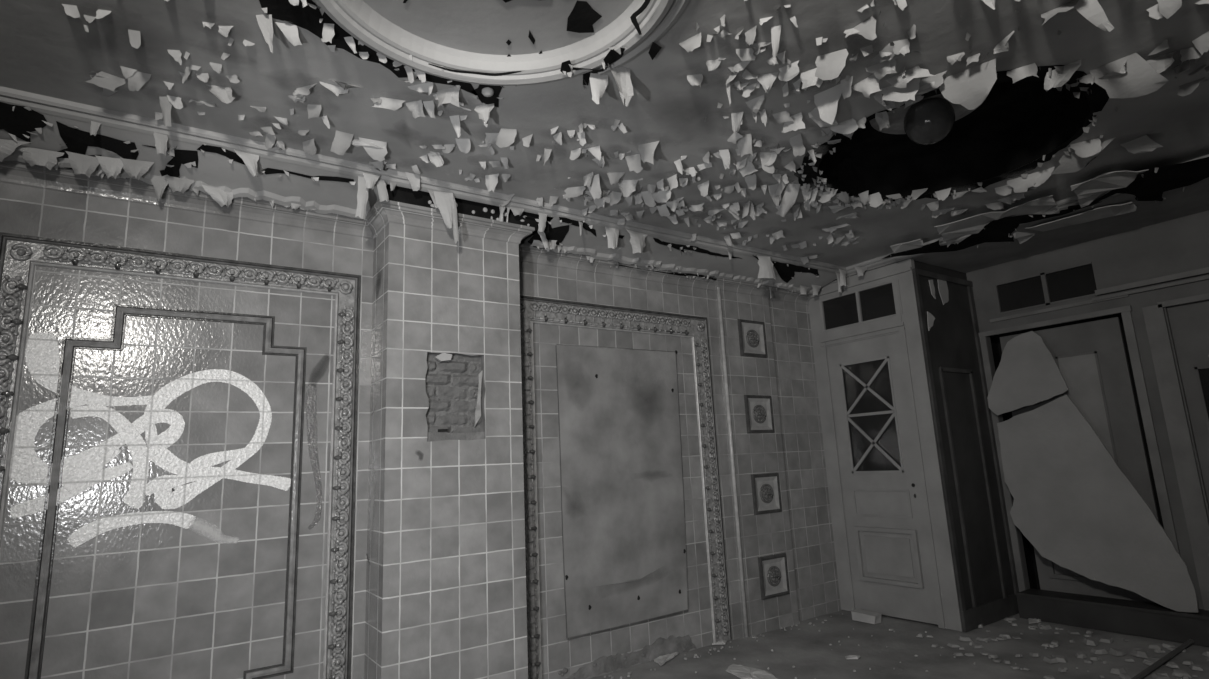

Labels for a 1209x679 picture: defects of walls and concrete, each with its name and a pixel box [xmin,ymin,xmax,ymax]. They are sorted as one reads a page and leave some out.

peeling [62,4,111,32]
peeling [85,0,1209,264]
spalling [434,353,452,362]
spalling [474,371,482,427]